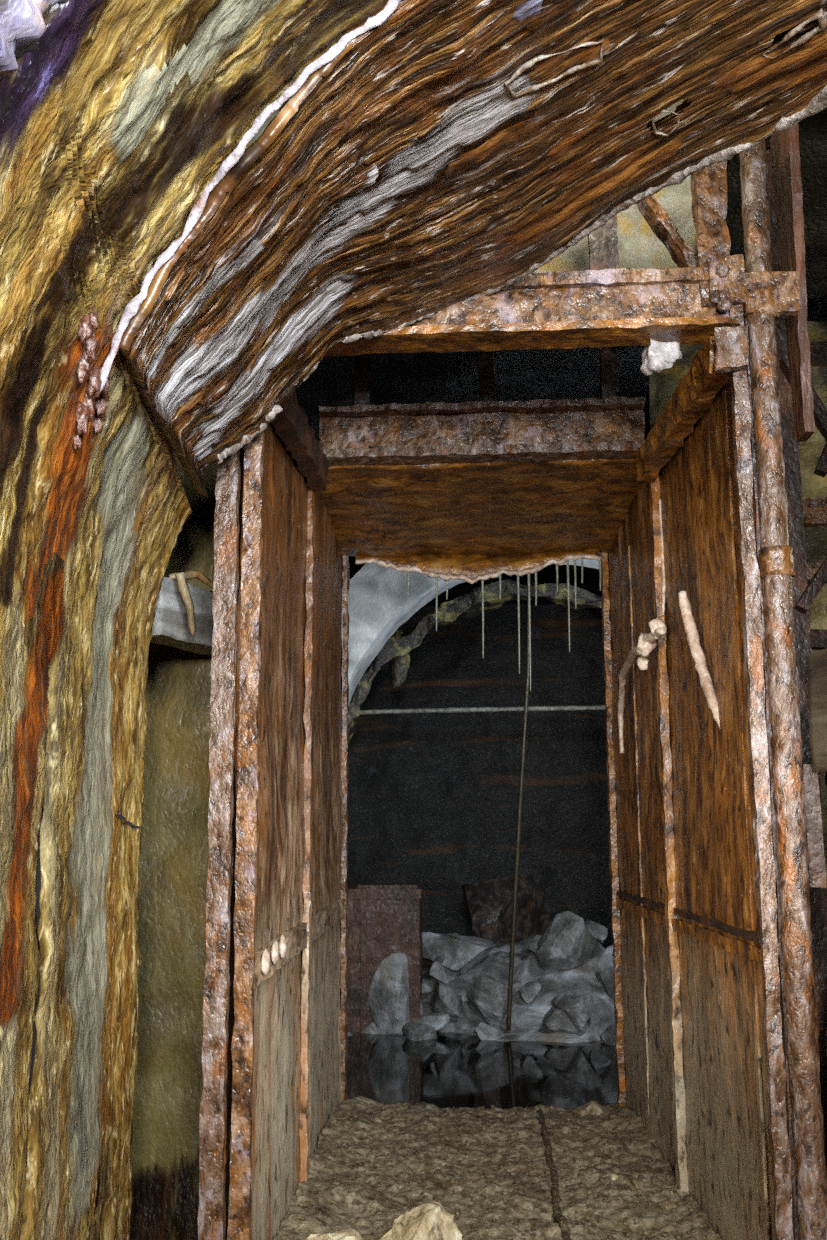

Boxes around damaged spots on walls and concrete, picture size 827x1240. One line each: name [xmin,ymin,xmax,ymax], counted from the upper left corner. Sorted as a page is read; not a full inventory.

damp [0,0,386,377]
rust [109,0,827,499]
rust [0,319,114,1025]
damp [54,76,537,1227]